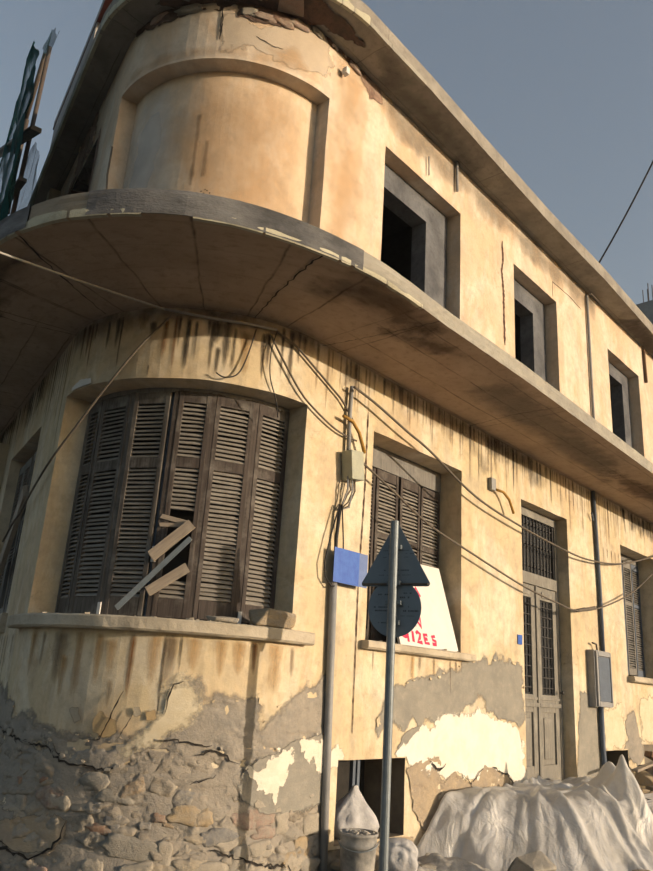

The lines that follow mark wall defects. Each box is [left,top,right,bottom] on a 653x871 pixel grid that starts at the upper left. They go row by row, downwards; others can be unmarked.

peeling [136,0,427,104]
crack [499,241,507,341]
damp [178,317,198,361]
damp [209,321,247,370]
damp [261,334,271,372]
damp [281,330,306,375]
crack [0,726,113,771]
crack [88,691,134,740]
peeling [0,674,344,871]
crack [155,739,240,785]
peeling [375,653,527,832]
peeling [577,691,653,779]